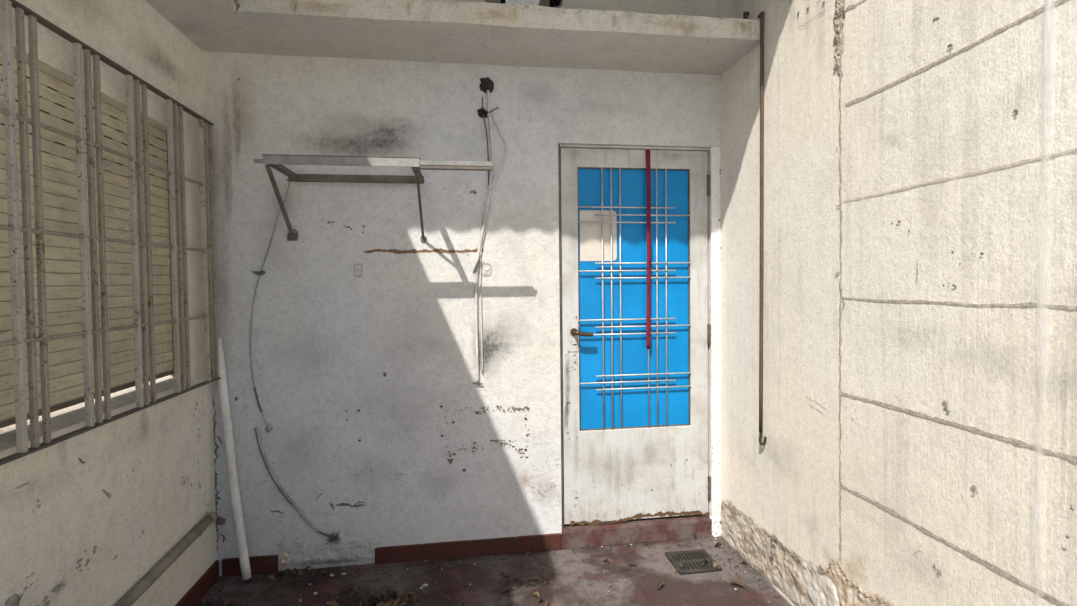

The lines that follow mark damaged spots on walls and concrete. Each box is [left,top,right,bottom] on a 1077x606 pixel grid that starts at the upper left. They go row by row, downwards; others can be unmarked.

spalling [478,0,699,35]
spalling [797,0,845,76]
peeling [444,405,530,464]
corrosion [570,510,709,526]
spalling [719,499,894,606]
spalling [0,568,39,606]